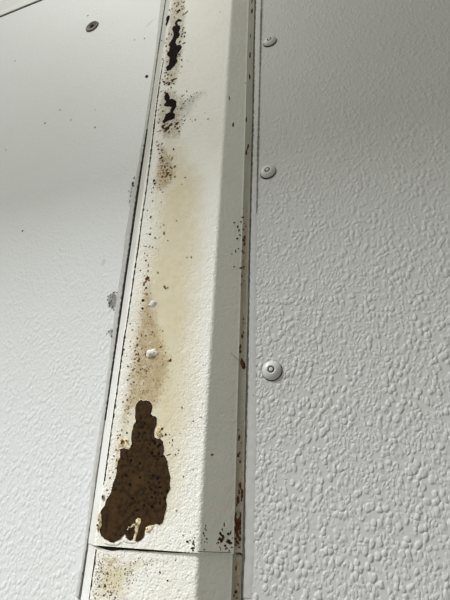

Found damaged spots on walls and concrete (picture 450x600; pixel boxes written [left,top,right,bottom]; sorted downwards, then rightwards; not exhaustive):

rust [151,0,188,202]
leakage [144,172,190,454]
rust [216,482,243,555]